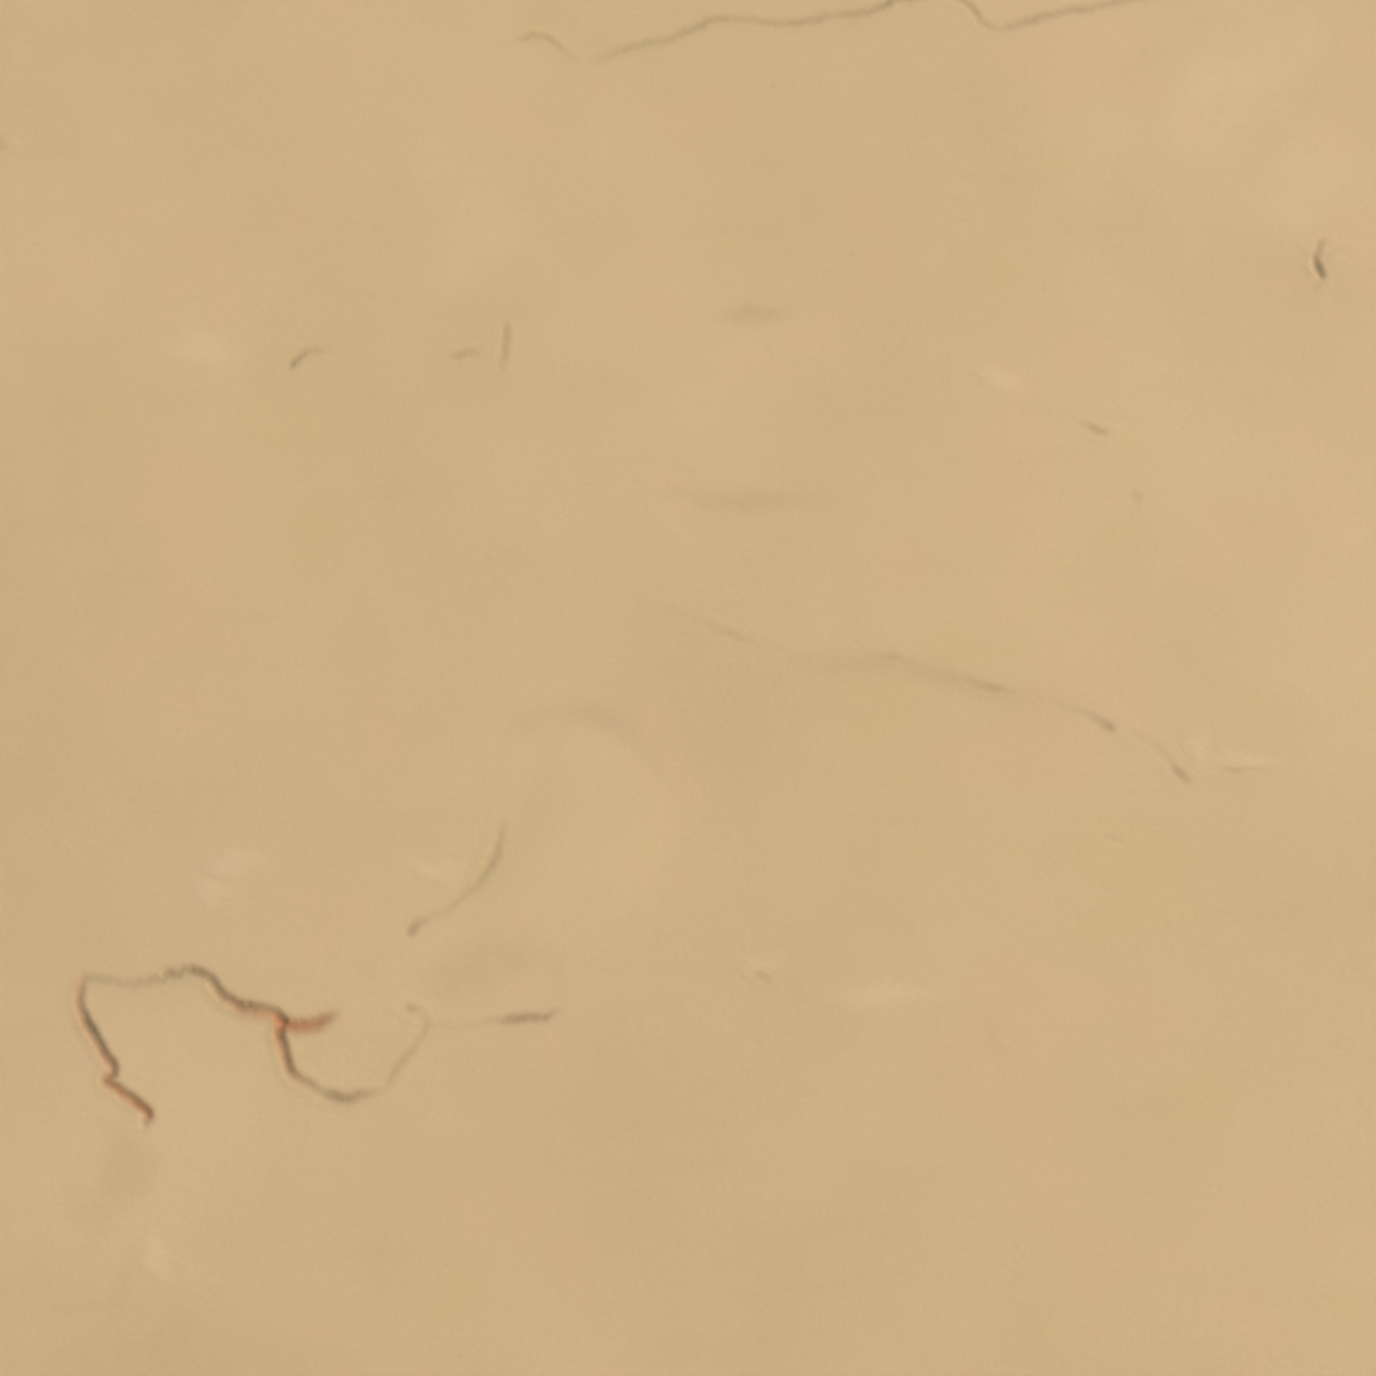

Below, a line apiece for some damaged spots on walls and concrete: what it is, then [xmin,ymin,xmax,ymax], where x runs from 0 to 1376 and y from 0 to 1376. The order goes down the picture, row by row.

crack [501,0,1170,80]
crack [63,955,581,1149]